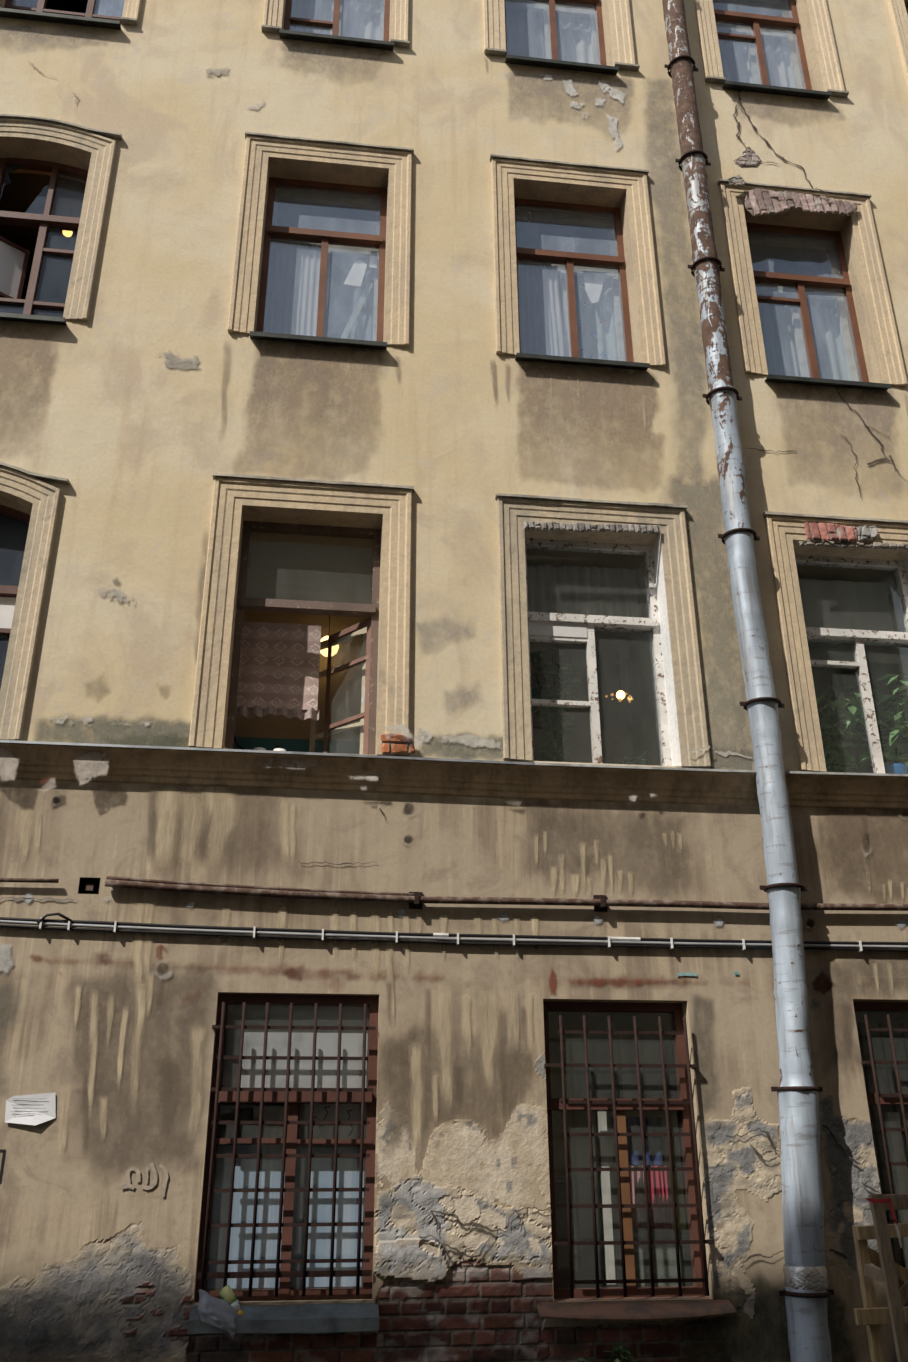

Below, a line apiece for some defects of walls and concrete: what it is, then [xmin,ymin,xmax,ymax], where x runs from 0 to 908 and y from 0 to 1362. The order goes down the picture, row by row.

peeling [540,74,625,150]
crack [733,90,832,196]
flaking render [728,147,858,216]
damp [521,366,657,450]
crack [836,387,908,497]
damp [673,419,752,770]
damp [149,785,295,863]
damp [74,904,210,1168]
damp [382,991,532,1143]
flaking render [0,1103,553,1362]
flaking render [700,1089,782,1318]
flaking render [819,1095,881,1279]